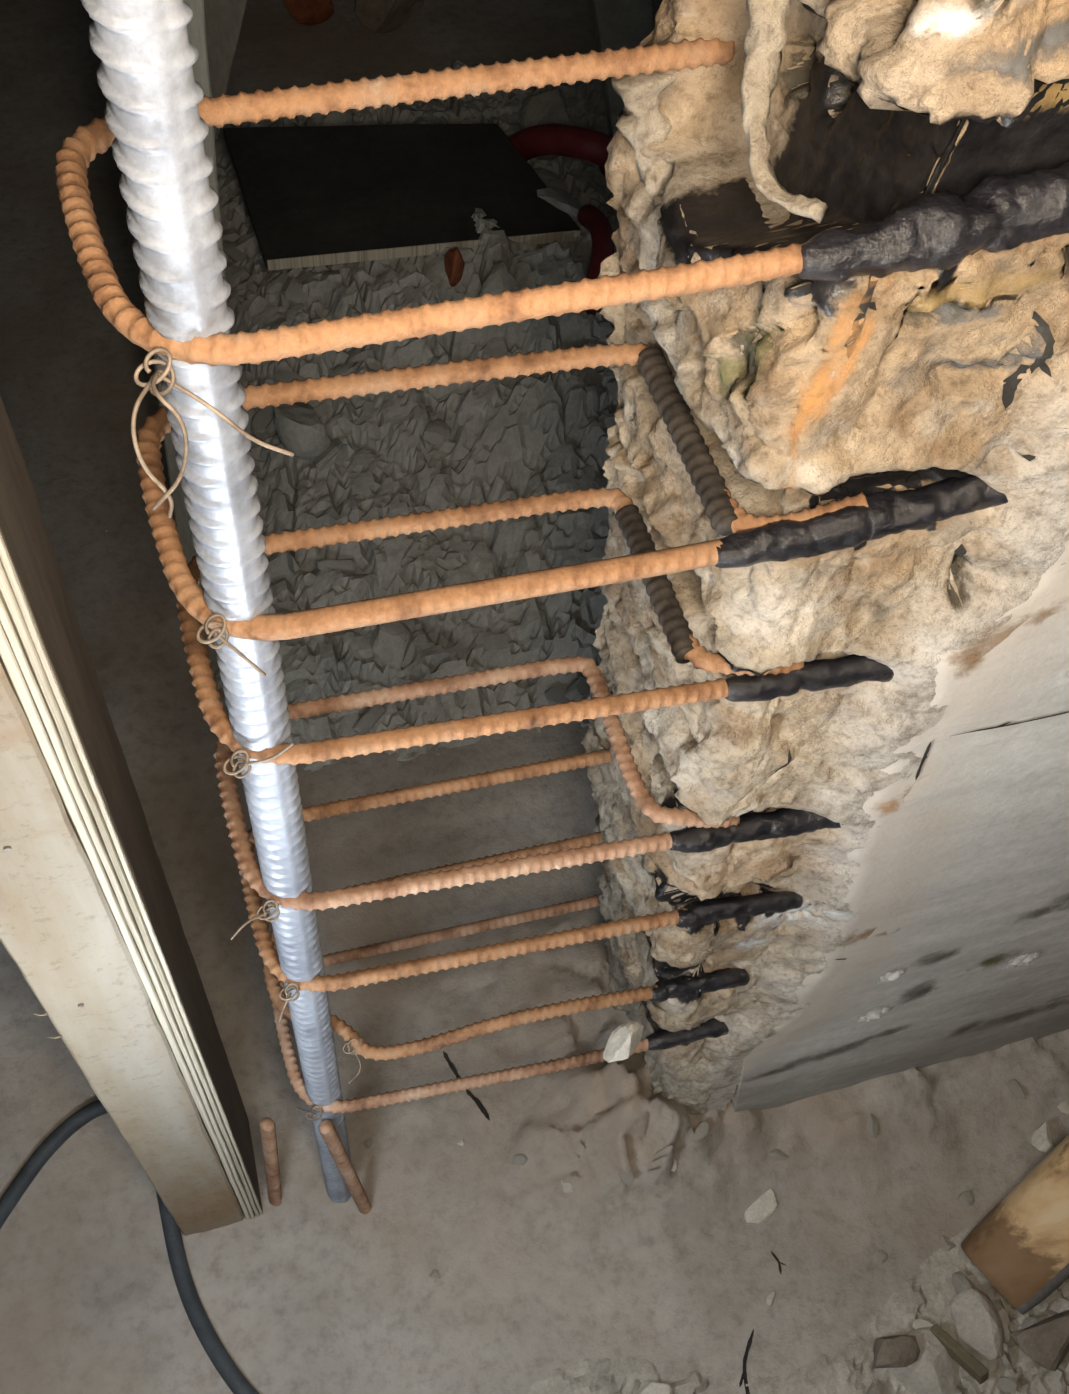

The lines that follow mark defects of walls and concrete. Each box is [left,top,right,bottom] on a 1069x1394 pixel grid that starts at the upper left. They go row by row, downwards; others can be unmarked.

spalling [598,0,1069,278]
rust [794,324,871,435]
spalling [581,233,1069,1115]
crack [915,711,1069,781]